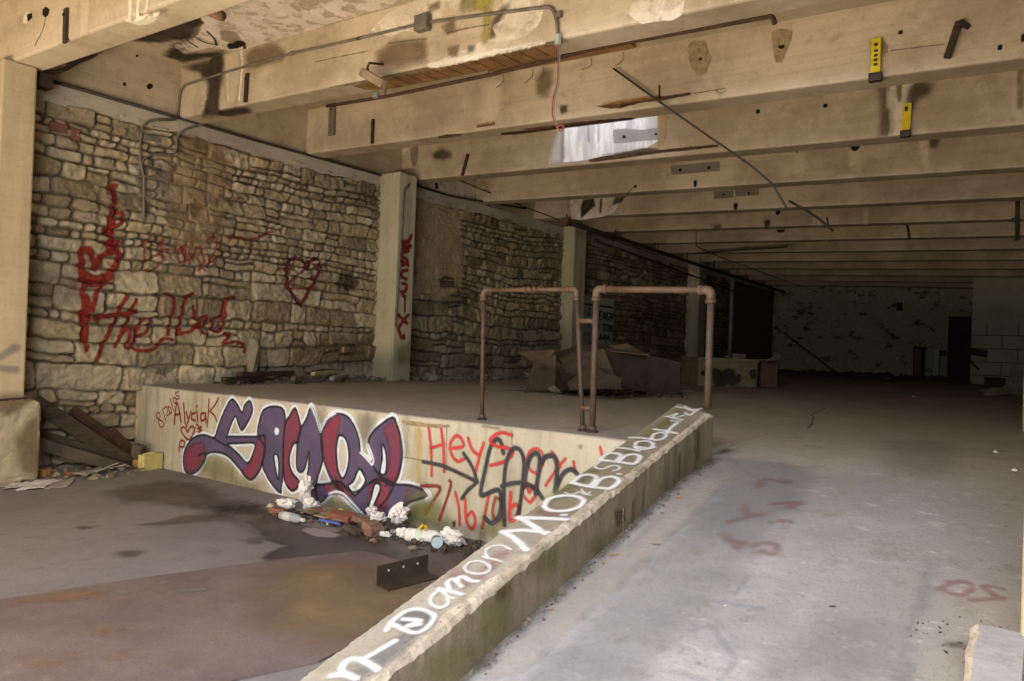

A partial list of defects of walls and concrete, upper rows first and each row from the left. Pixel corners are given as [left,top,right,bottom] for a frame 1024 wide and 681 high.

peeling [629,0,685,24]
leakage [188,45,283,117]
spalling [330,0,557,90]
leakage [378,9,547,69]
spalling [688,40,712,75]
spalling [771,29,793,63]
leakage [880,87,889,135]
leakage [909,83,931,105]